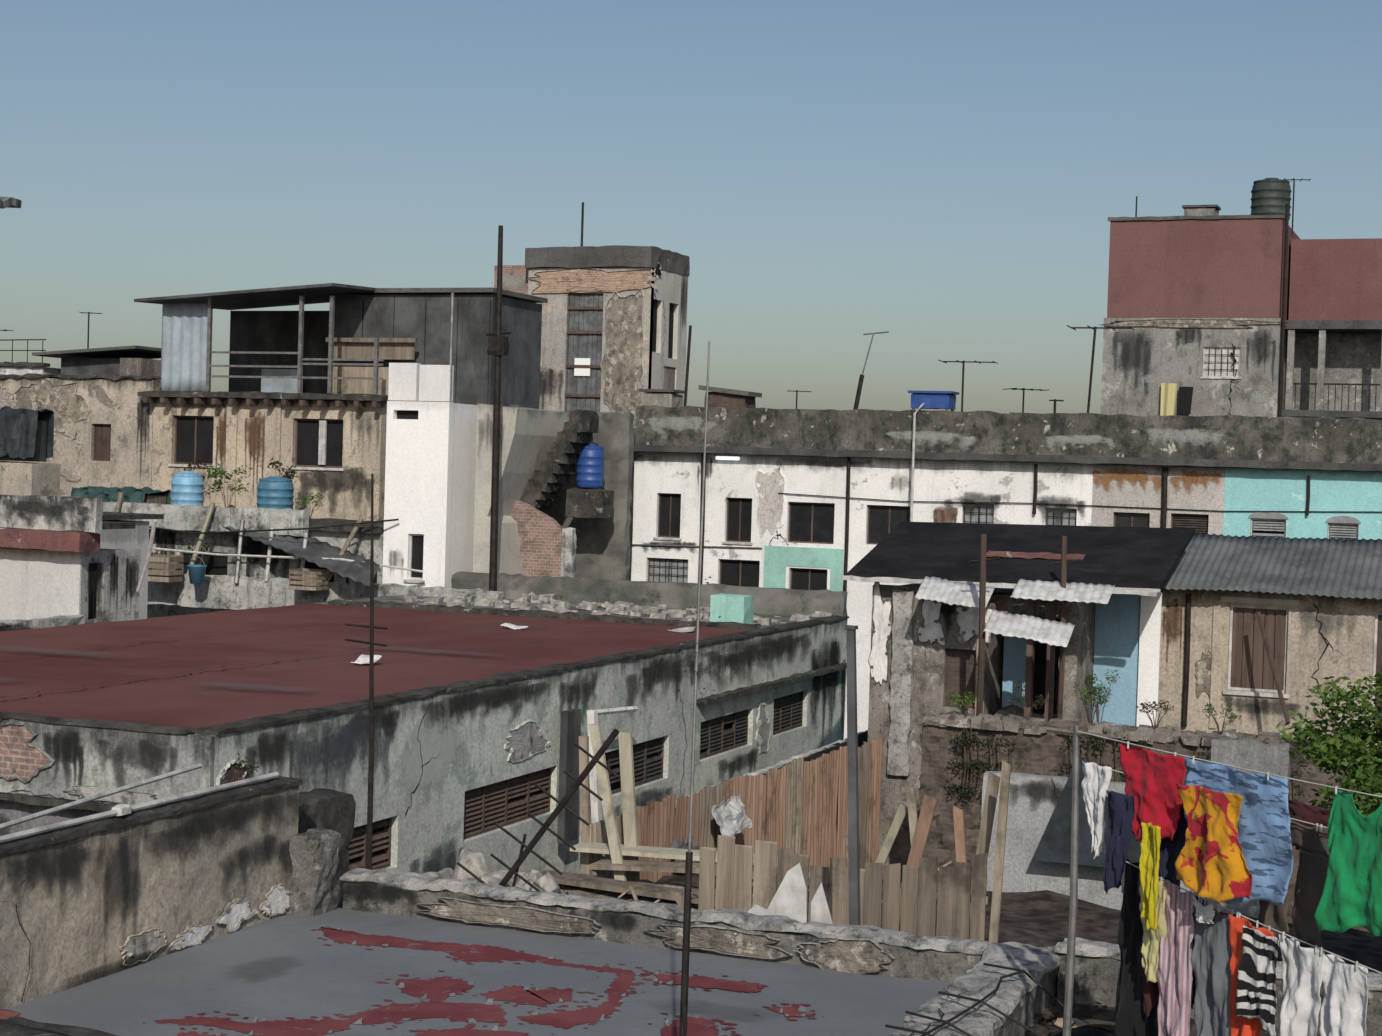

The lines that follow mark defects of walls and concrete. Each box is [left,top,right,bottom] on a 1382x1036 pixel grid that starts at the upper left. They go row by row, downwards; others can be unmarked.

damp [1113,332,1159,388]
damp [1176,328,1201,352]
damp [1247,333,1276,374]
rust [1092,469,1221,490]
damp [626,634,847,734]
spalling [0,718,55,783]
damp [10,709,399,937]
damp [340,881,415,903]
damp [66,947,170,987]
spalling [118,883,291,965]
peeling [142,926,824,1036]
spalling [643,924,895,975]